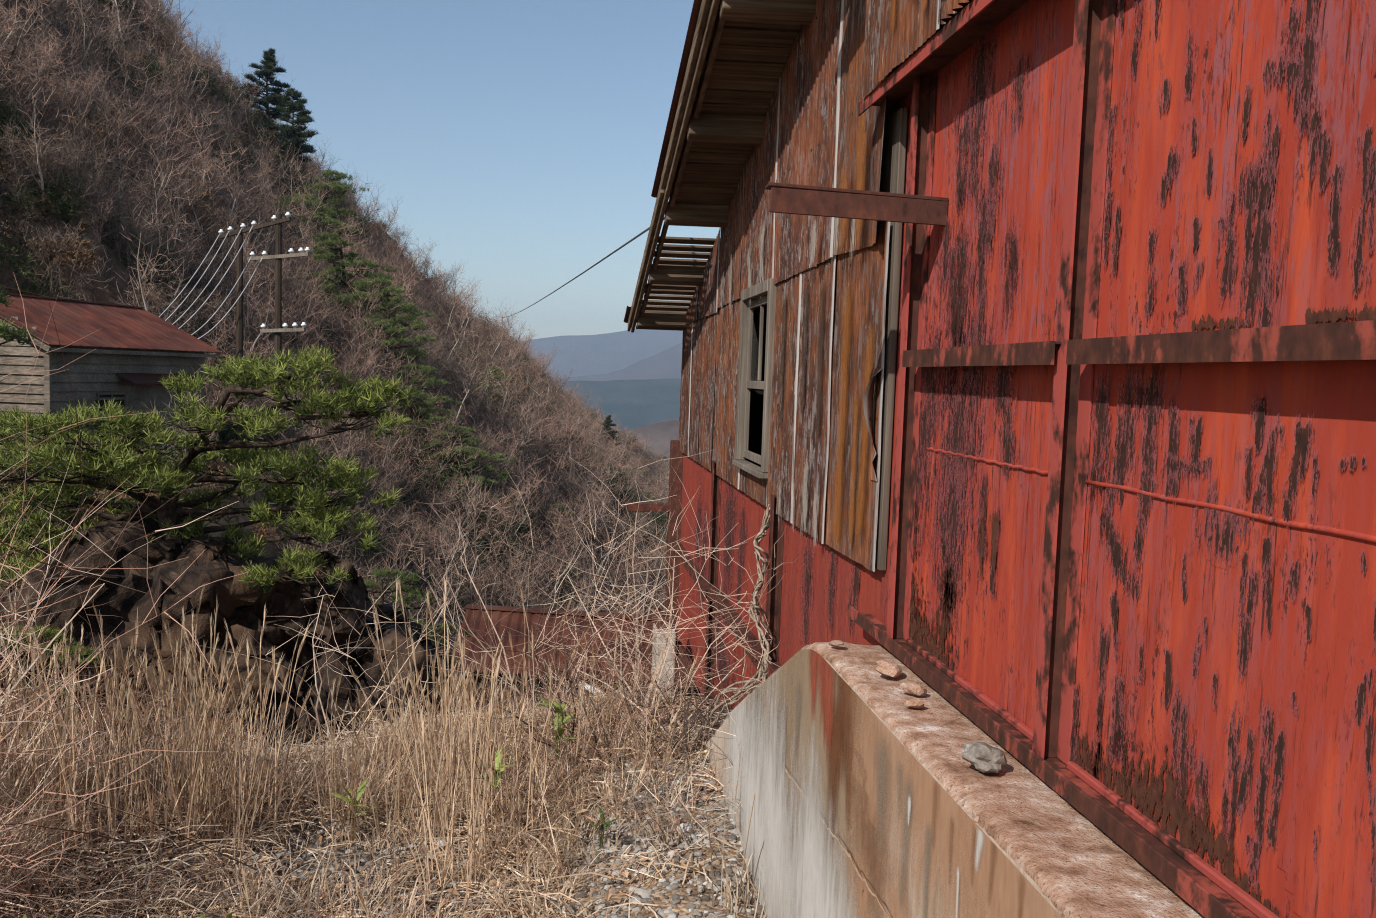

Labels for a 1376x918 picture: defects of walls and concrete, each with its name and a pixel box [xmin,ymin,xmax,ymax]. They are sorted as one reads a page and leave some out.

peeling [1118,0,1160,79]
peeling [1102,102,1122,277]
peeling [1156,0,1376,329]
leakage [801,287,824,433]
corrosion [834,289,874,544]
peeling [1144,226,1157,319]
corrosion [1192,314,1251,332]
corrosion [1305,301,1376,324]
corrosion [909,515,959,669]
corrosion [976,511,999,579]
corrosion [810,650,1061,918]
corrosion [1062,710,1287,918]